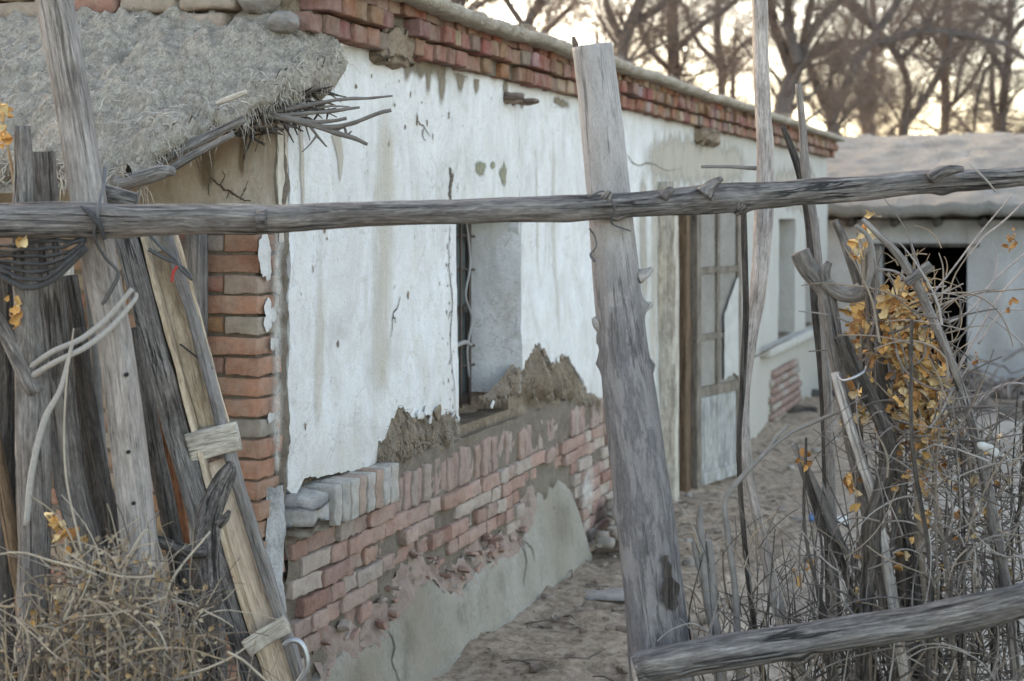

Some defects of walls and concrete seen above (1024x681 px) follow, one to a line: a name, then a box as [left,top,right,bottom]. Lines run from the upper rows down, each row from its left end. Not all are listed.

water stain [405,60,479,100]
crack [207,171,251,202]
peeling [476,161,507,185]
peeling [264,298,277,350]
spalling [474,346,603,417]
spalling [374,404,462,473]
spalling [313,485,538,681]